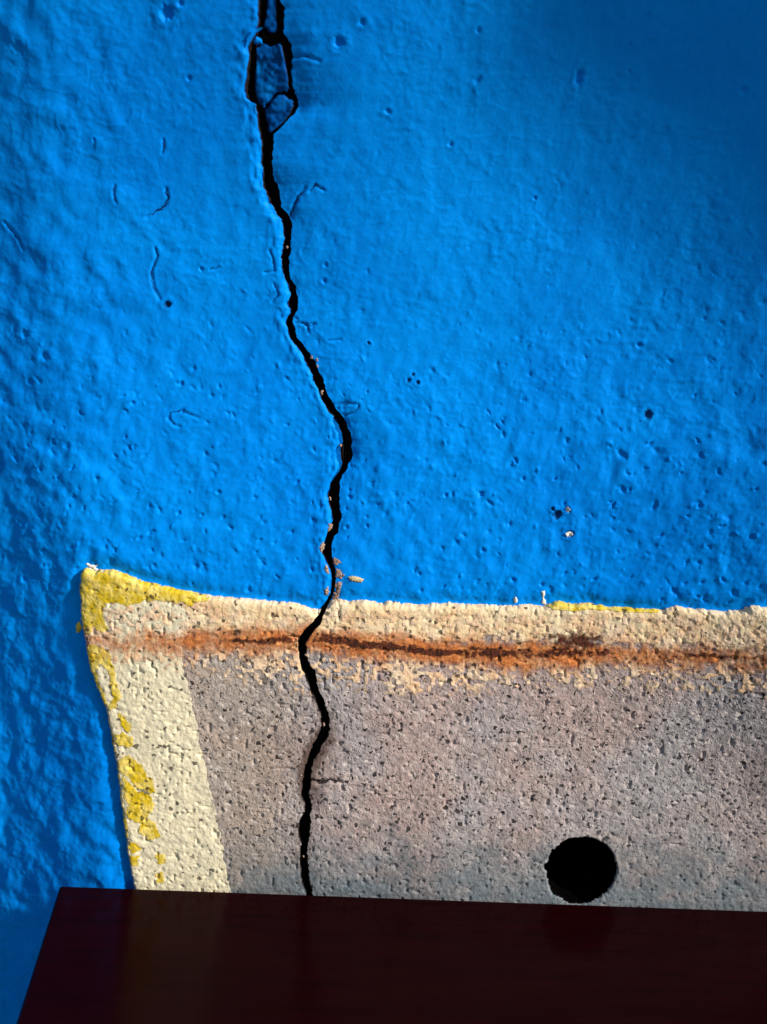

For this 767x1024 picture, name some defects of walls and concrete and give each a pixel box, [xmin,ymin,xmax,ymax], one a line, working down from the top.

crack [245,0,405,896]
peeling [76,563,767,893]
corrosion [135,626,767,673]